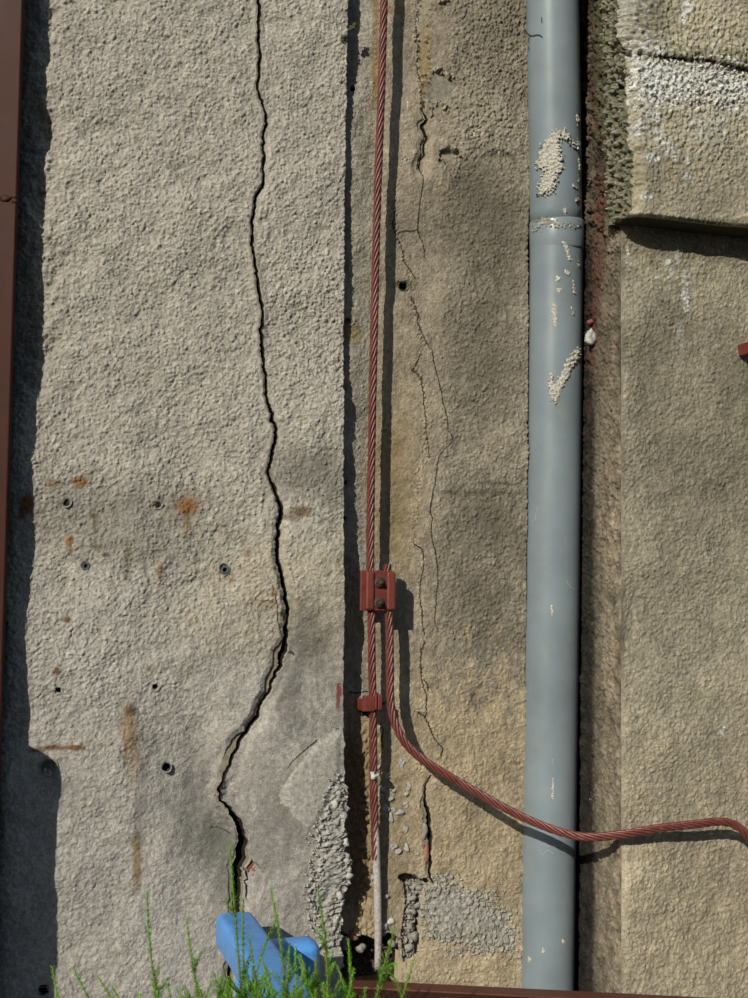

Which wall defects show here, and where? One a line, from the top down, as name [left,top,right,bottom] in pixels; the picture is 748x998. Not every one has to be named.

crack [392,0,432,260]
efflorescence [617,0,748,180]
crack [211,0,295,913]
rust [19,494,34,518]
rust [178,498,195,528]
rust [282,507,310,519]
crack [415,348,461,885]
spalling [396,873,428,961]
crack [222,958,235,998]